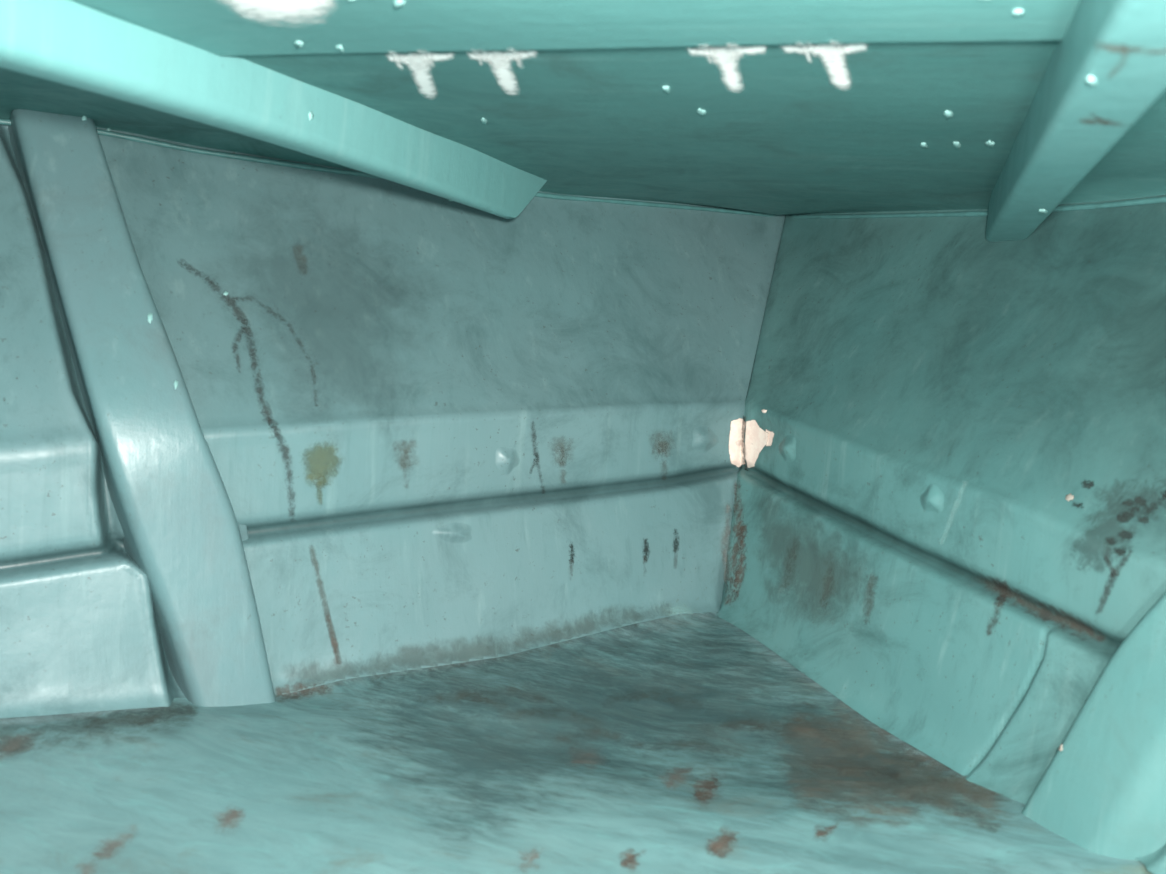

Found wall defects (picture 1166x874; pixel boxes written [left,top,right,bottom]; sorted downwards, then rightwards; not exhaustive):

crack [1102,44,1166,64]
spalling [729,409,774,469]
water stain [304,445,338,499]
corrosion [726,485,746,603]
corrosion [986,580,1104,641]
corrosion [708,833,736,858]